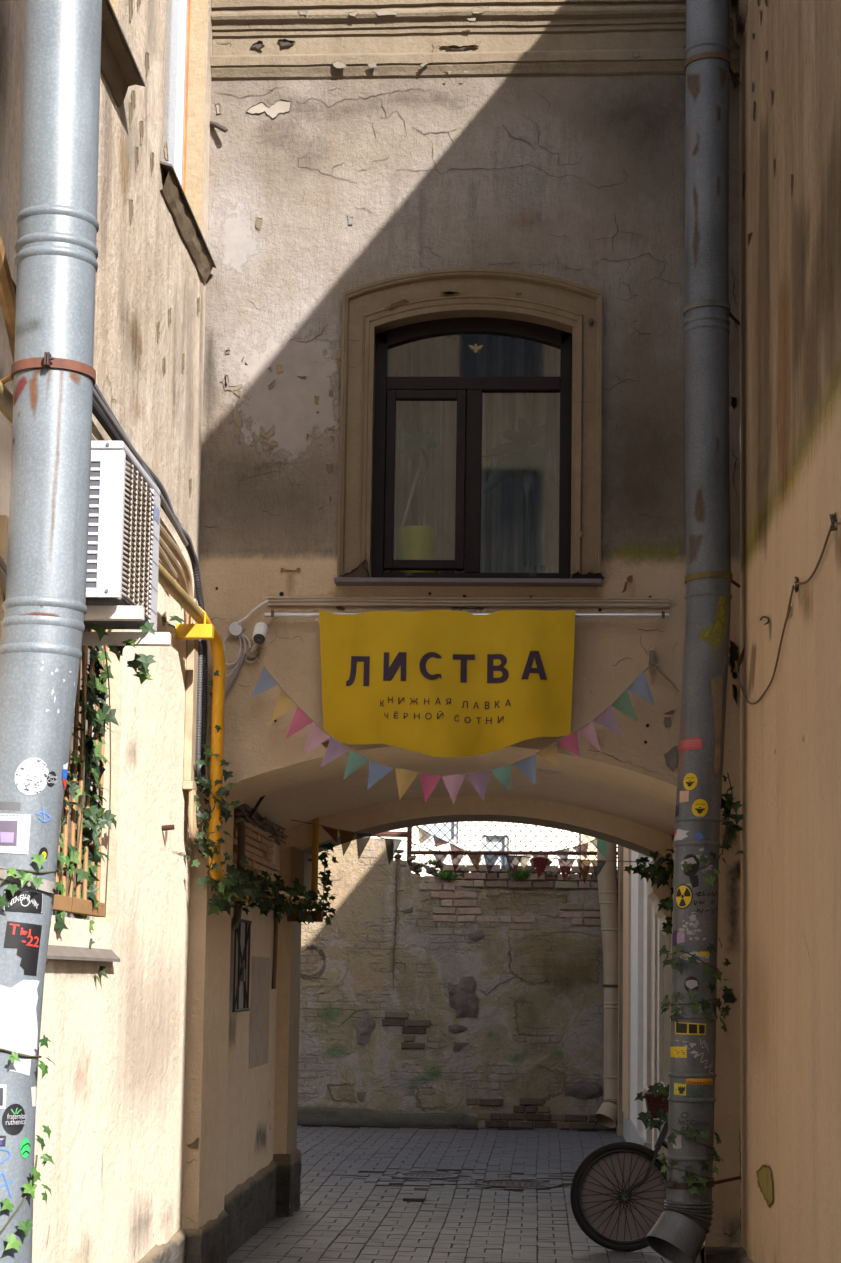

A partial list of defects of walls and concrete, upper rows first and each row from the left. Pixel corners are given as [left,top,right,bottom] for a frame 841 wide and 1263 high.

peeling [250,38,295,52]
peeling [246,99,292,119]
crack [214,84,627,229]
crack [488,218,680,335]
rust [31,368,40,408]
peeling [220,374,244,398]
flaking render [356,1008,430,1059]
flaking render [448,976,479,1052]